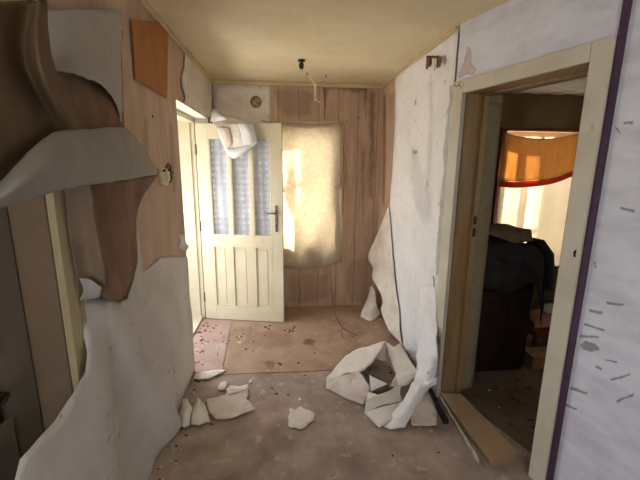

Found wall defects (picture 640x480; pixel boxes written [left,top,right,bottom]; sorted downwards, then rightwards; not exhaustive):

peeling [179,233,189,251]